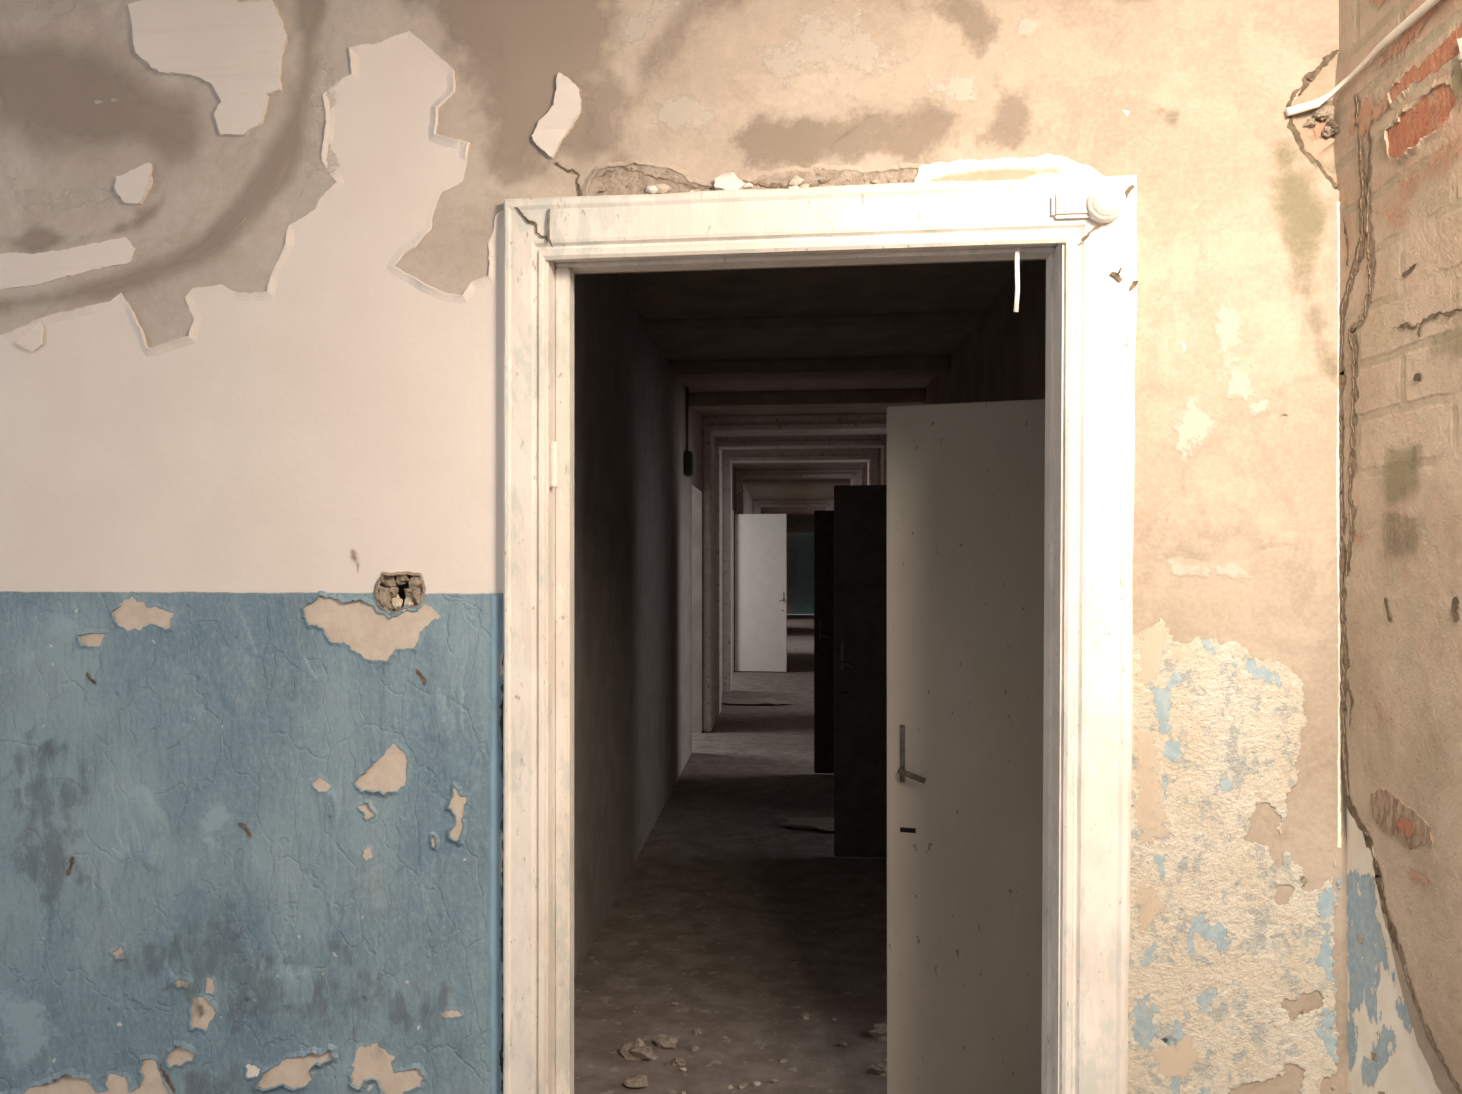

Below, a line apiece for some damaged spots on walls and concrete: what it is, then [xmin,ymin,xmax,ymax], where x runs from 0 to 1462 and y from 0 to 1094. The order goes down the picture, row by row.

water stain [96,66,337,291]
peeling [0,0,581,356]
water stain [442,0,685,171]
crack [555,162,582,196]
water stain [764,10,900,85]
water stain [741,75,975,163]
crack [1338,95,1462,797]
peeling [1127,0,1462,1094]
peeling [299,571,446,665]
peeling [351,738,412,822]
peeling [0,973,221,1094]
peeling [242,1039,428,1094]